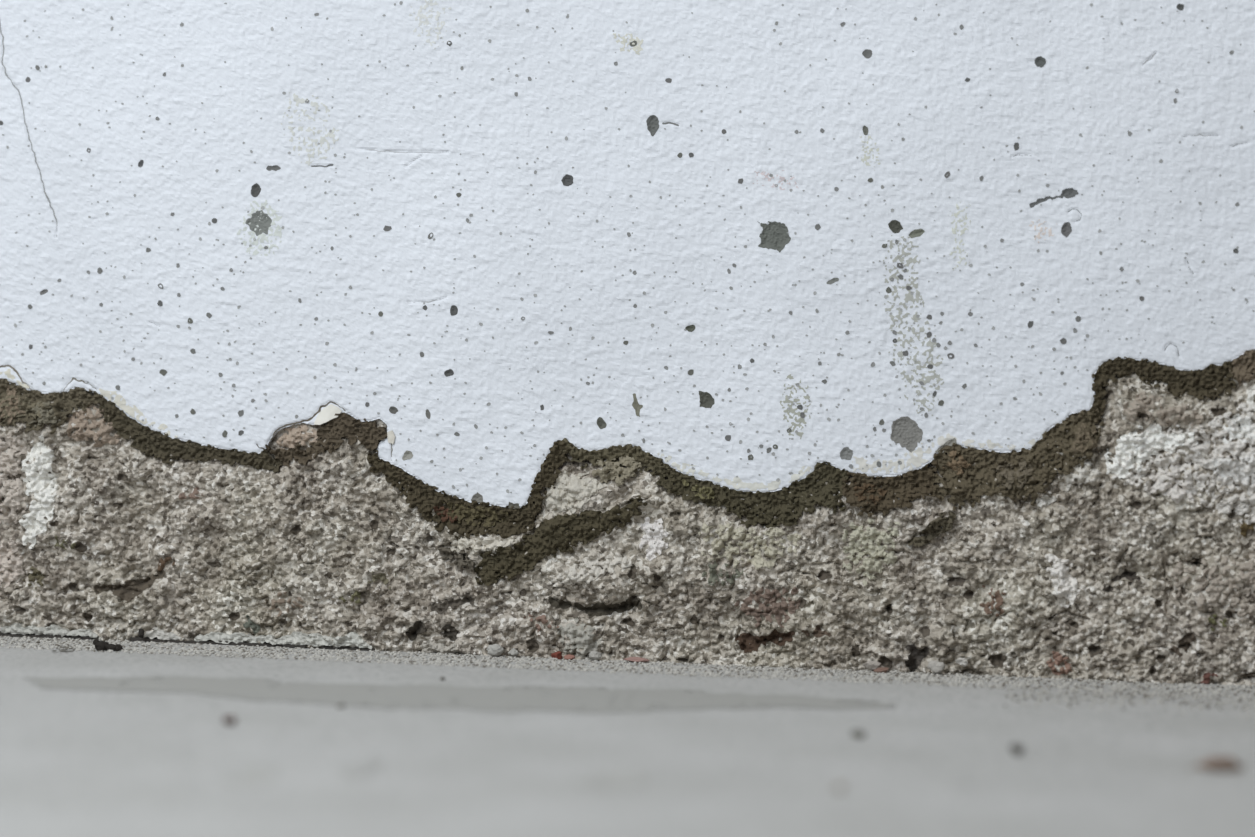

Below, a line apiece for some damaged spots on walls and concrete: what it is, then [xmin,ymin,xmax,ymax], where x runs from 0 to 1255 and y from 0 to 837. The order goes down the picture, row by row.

crack [0,23,57,237]
peeling [314,404,342,425]
peeling [632,393,643,417]
peeling [699,391,715,408]
peeling [890,416,923,453]
peeling [387,431,413,460]
peeling [840,447,853,460]
spalling [947,577,973,599]
spalling [526,640,539,653]
spalling [877,656,892,670]
spalling [988,654,1007,667]
spalling [1088,645,1119,665]